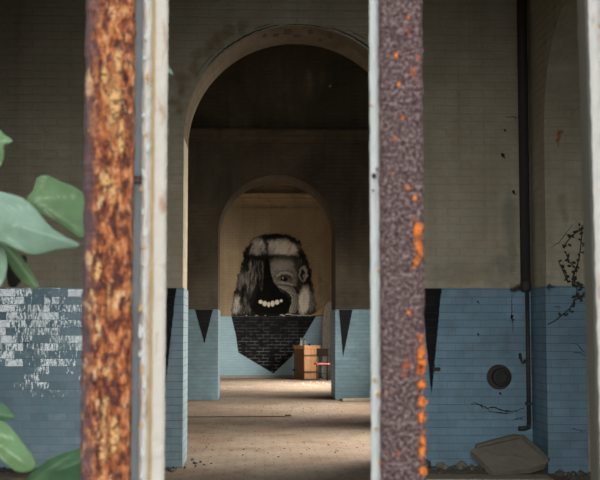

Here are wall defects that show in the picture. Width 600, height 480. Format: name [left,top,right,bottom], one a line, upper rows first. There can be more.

corrosion [114,50,122,72]
corrosion [101,67,124,153]
corrosion [101,173,116,203]
corrosion [411,223,423,269]
corrosion [417,335,427,423]
corrosion [99,398,119,463]
crack [474,402,525,421]
corrosion [419,436,427,475]